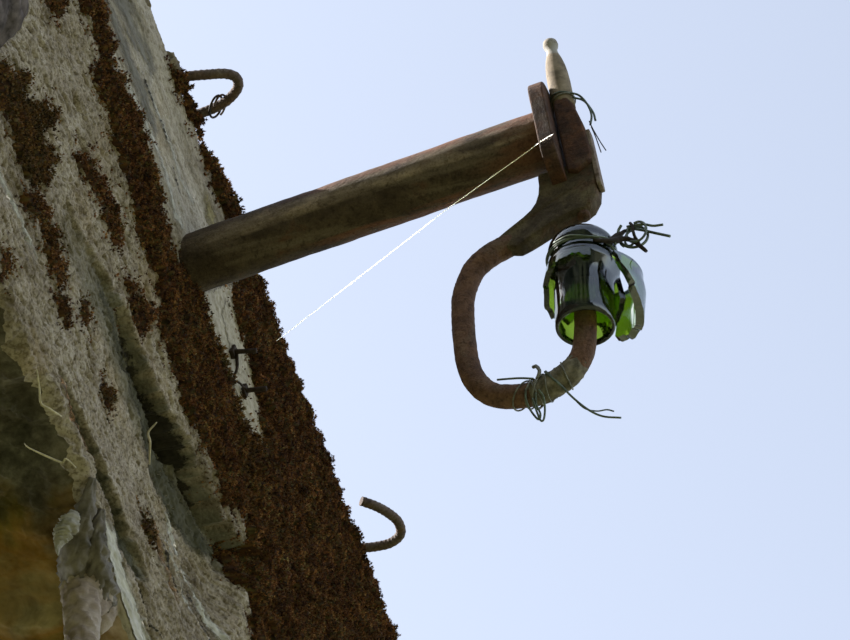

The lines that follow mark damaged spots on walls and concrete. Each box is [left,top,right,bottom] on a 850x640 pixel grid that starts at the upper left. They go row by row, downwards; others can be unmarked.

spalling [111,508,141,576]